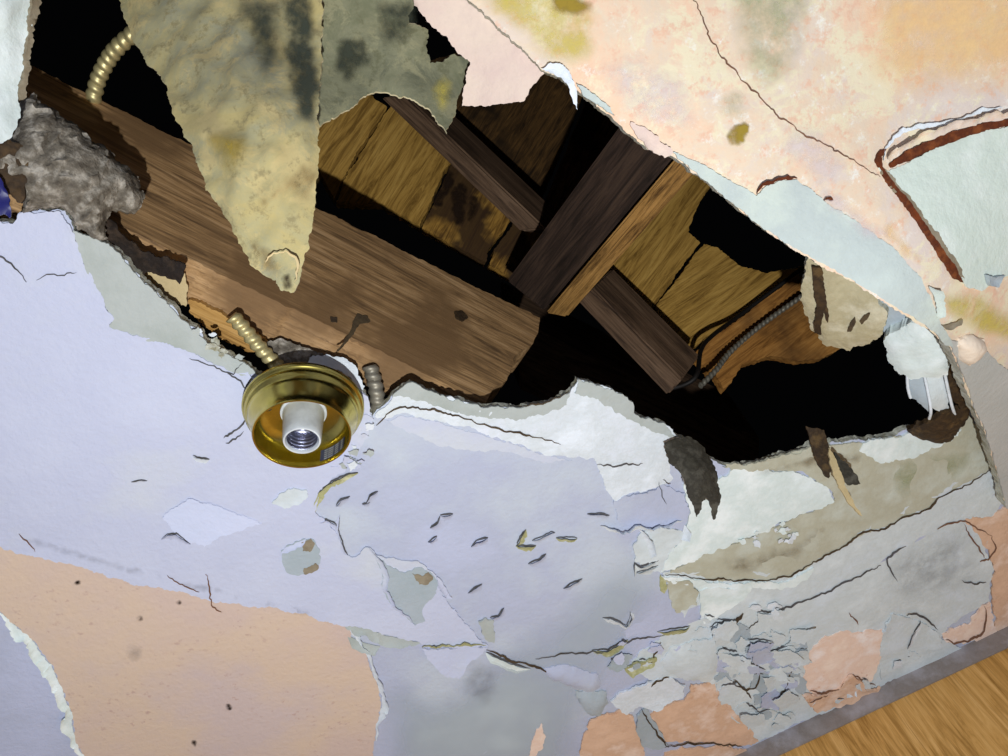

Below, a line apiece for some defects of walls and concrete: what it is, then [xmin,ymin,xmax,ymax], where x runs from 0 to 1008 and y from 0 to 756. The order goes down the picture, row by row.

damp [552,0,588,17]
damp [245,0,319,118]
damp [338,41,367,79]
crack [693,0,876,175]
damp [728,123,749,144]
peeling [874,106,1008,291]
crack [376,406,561,445]
peeling [0,152,1008,750]
crack [666,470,997,645]
crack [487,635,669,687]
crack [735,671,792,699]